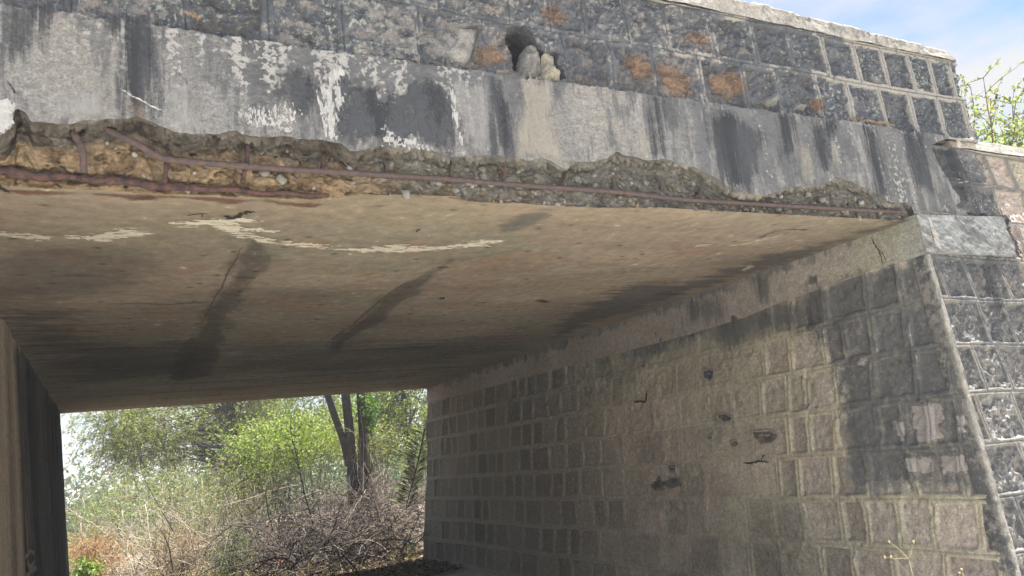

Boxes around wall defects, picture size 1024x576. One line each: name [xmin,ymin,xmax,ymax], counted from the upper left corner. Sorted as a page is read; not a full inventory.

damp [106,12,165,116]
rust [97,194,243,204]
damp [274,73,320,113]
damp [335,74,455,148]
spalling [0,64,914,221]
damp [705,114,766,194]
damp [778,112,797,162]
damp [813,118,836,170]
damp [863,126,887,202]
crack [124,244,243,324]
spalling [751,429,779,445]